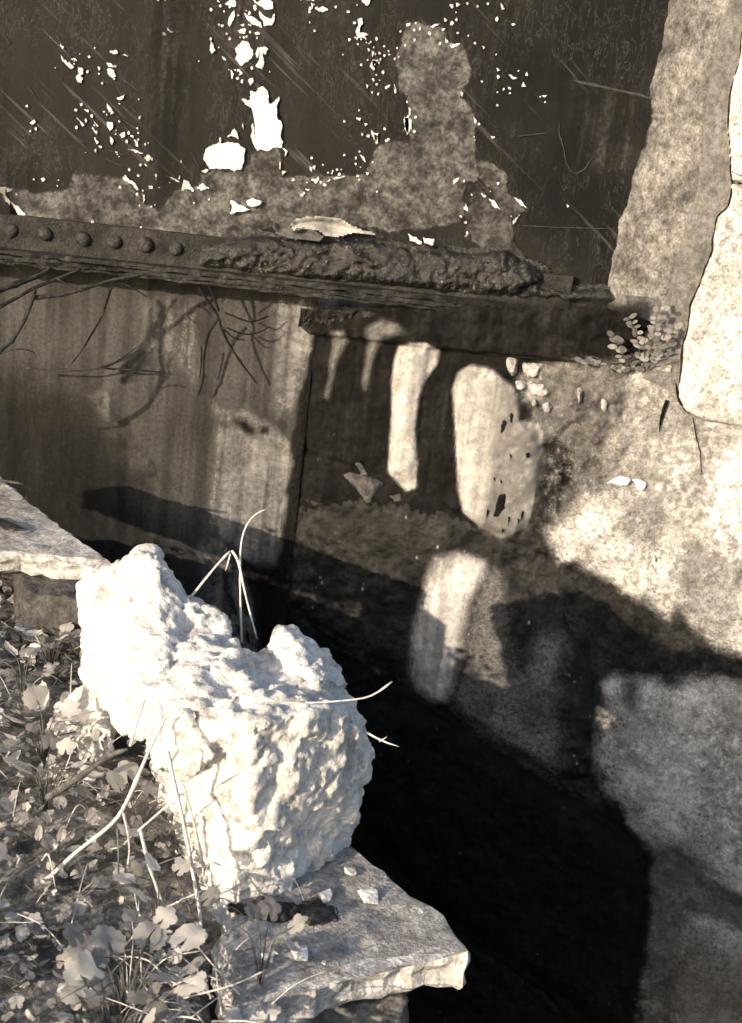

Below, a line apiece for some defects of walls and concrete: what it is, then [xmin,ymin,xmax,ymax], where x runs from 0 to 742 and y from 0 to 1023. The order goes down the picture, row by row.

peeling [55,44,127,85]
peeling [347,2,489,95]
peeling [74,0,294,208]
peeling [343,110,390,143]
peeling [403,101,417,135]
corrosion [8,21,615,303]
peeling [300,150,374,196]
peeling [0,187,26,215]
peeling [230,198,262,214]
peeling [408,234,434,245]
crack [659,32,742,476]